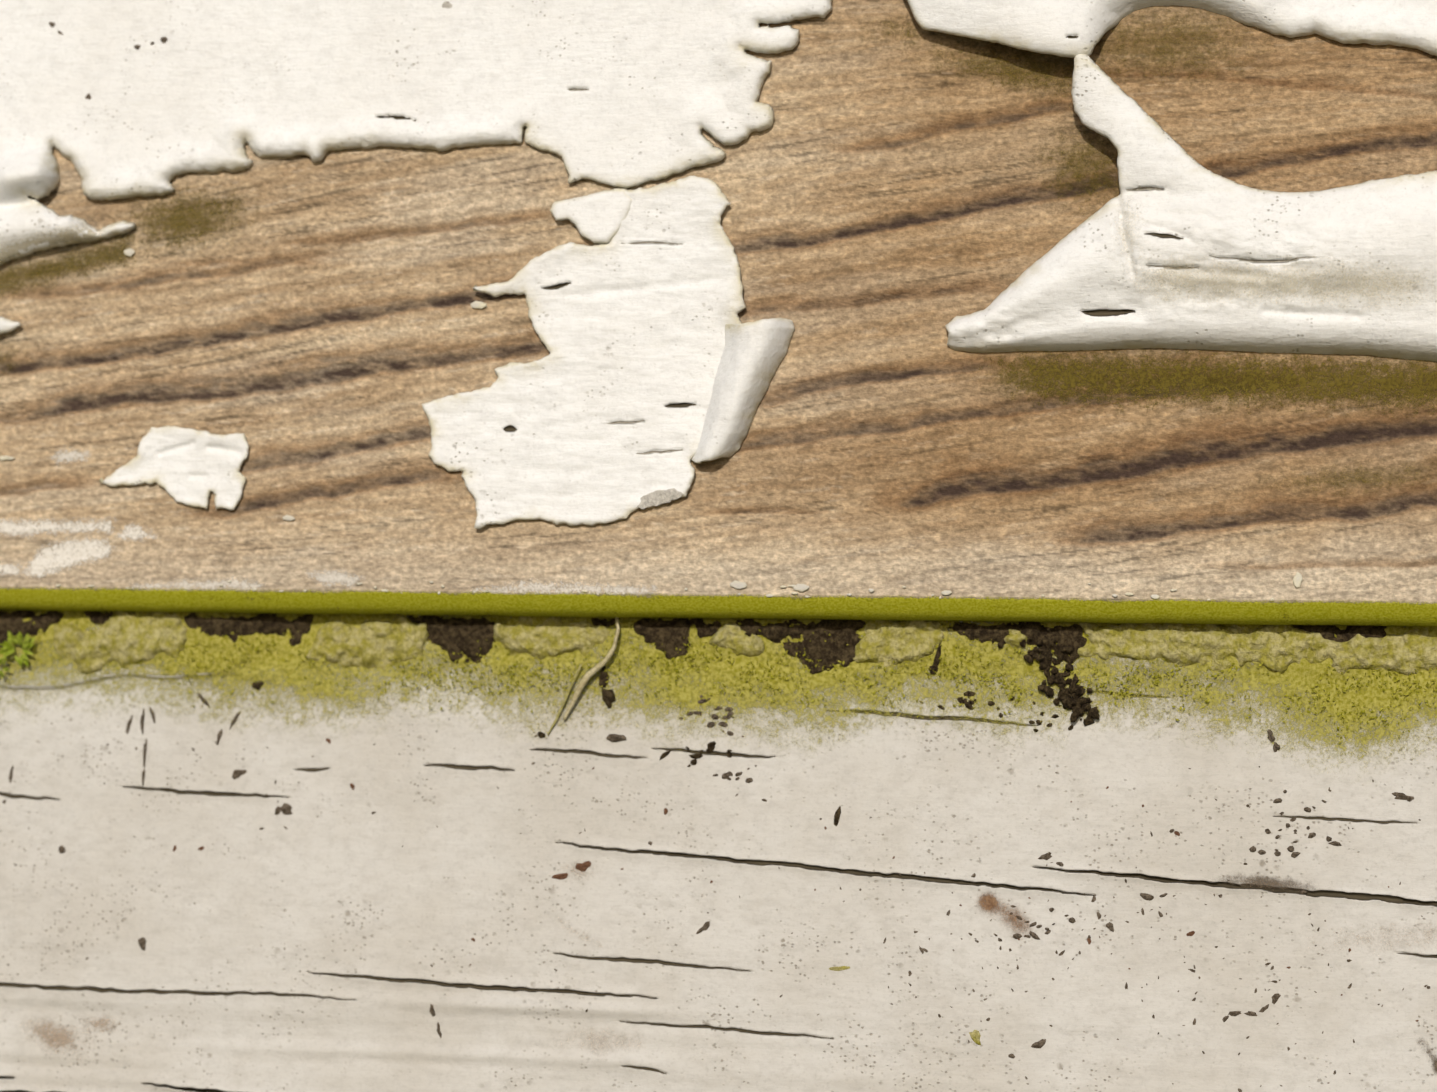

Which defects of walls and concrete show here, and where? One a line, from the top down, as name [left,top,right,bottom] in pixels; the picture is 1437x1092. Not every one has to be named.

peeling [907,0,1437,362]
peeling [0,0,833,529]
peeling [766,584,810,598]
crack [424,748,775,771]
crack [127,768,329,797]
crack [555,842,1437,907]
crack [0,953,833,1039]
crack [0,1076,59,1092]
crack [145,1083,225,1092]
crack [622,1066,667,1074]